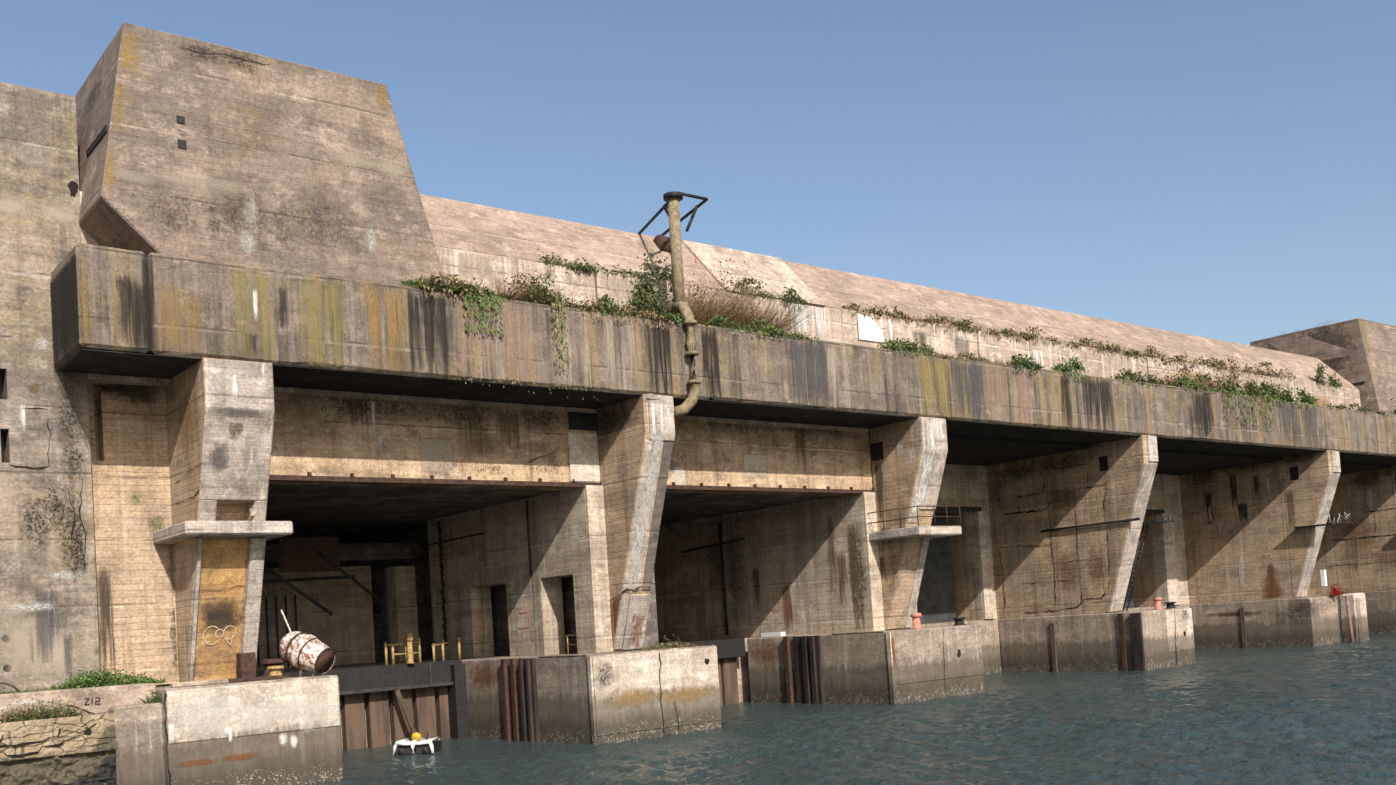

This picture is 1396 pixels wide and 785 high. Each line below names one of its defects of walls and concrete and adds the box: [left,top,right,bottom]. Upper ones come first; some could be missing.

damp [38,253,79,371]
damp [119,259,200,349]
damp [234,274,343,374]
damp [367,290,530,376]
damp [701,329,721,399]
damp [788,303,836,405]
damp [857,314,892,343]
damp [915,332,1031,416]
damp [24,483,88,579]
damp [98,575,115,661]
corrosion [1266,565,1281,598]
crack [0,705,105,757]